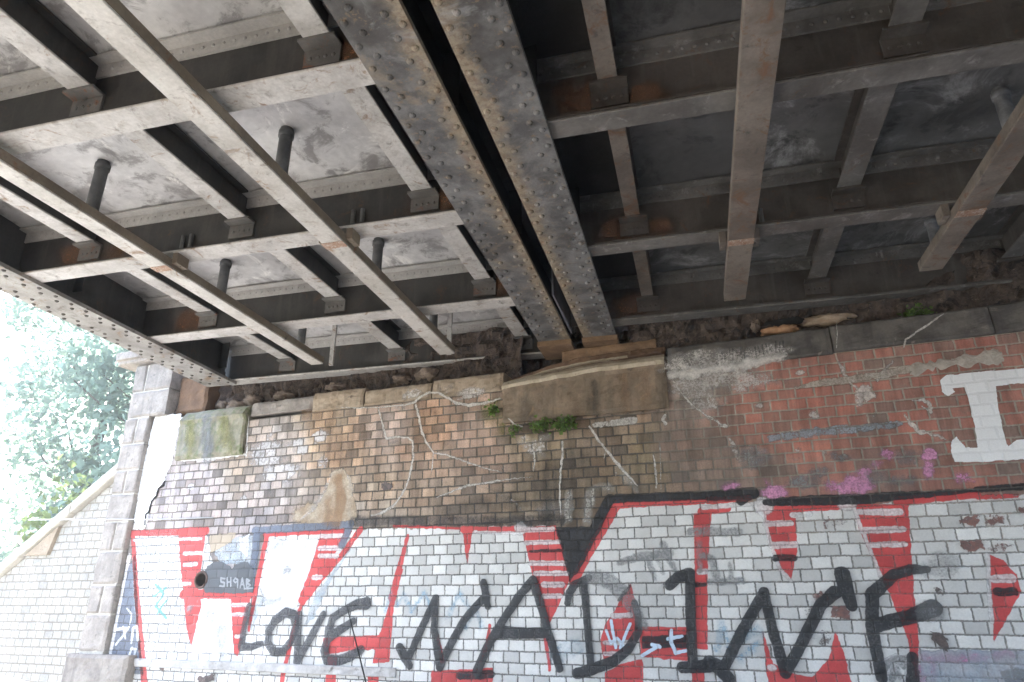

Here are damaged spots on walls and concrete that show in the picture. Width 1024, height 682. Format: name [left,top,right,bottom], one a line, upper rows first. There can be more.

crack [903,314,943,348]
leakage [665,347,785,408]
peeling [133,414,328,530]
crack [342,391,521,516]
crack [588,426,638,486]